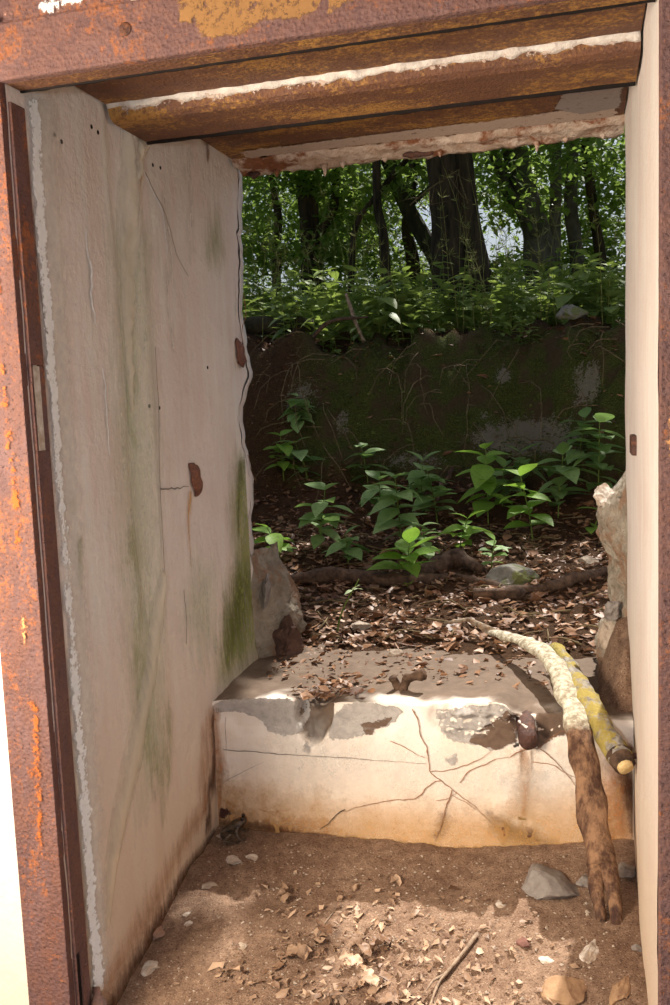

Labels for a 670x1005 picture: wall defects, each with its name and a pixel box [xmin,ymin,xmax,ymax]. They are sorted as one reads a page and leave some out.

peeling [177,0,353,38]
rust [0,386,21,544]
rust [27,701,43,855]
spalling [328,700,402,740]
crack [222,709,575,840]
spalling [435,704,518,766]